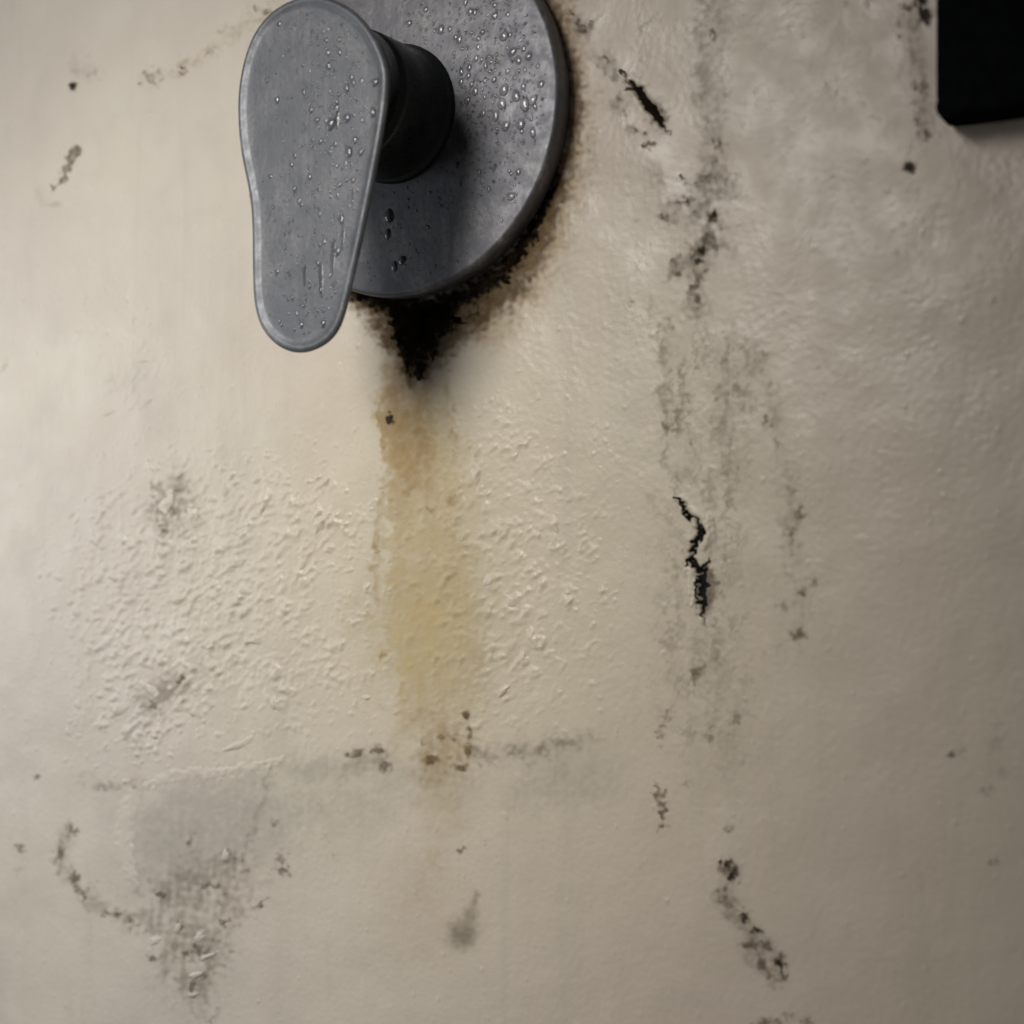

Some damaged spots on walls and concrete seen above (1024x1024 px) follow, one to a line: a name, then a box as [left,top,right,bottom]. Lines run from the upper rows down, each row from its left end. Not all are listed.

crack [619,69,671,136]
mould [349,82,582,387]
mould [691,211,716,264]
crack [672,496,716,623]
mould [719,860,738,890]
mould [741,913,787,979]